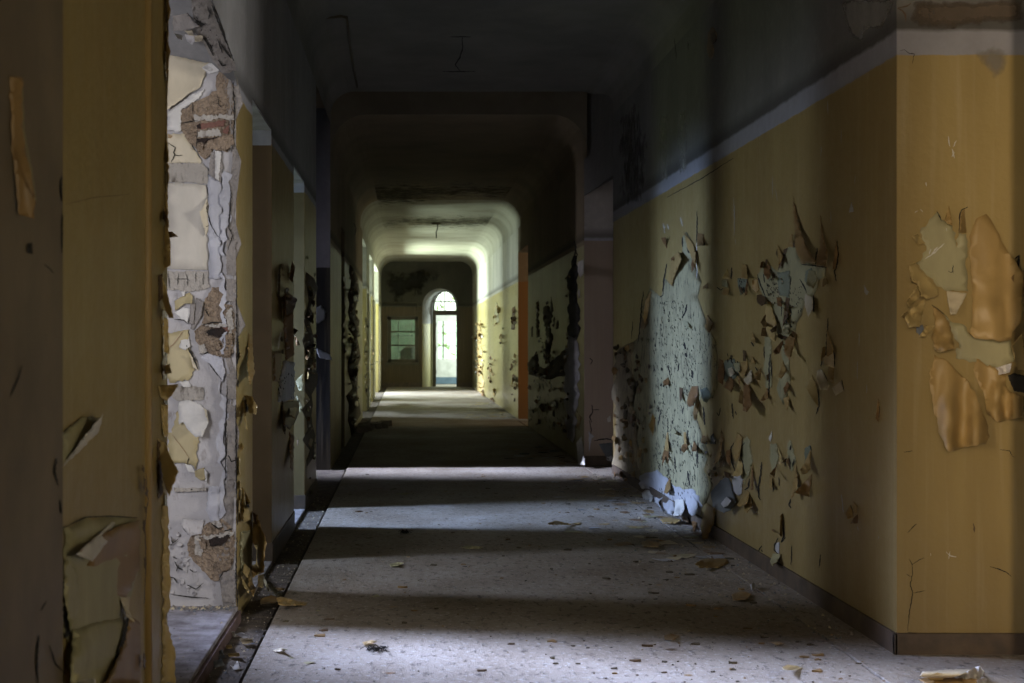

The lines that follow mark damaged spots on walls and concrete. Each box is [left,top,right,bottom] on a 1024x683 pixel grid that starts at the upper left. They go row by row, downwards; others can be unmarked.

peeling [8,76,36,219]
peeling [63,415,103,466]
spalling [157,0,277,683]
peeling [272,262,332,495]
peeling [342,265,375,436]
peeling [471,302,516,402]
peeling [509,199,844,539]
peeling [758,431,812,566]
peeling [901,207,1024,451]
peeling [63,515,141,683]
crack [907,558,923,633]